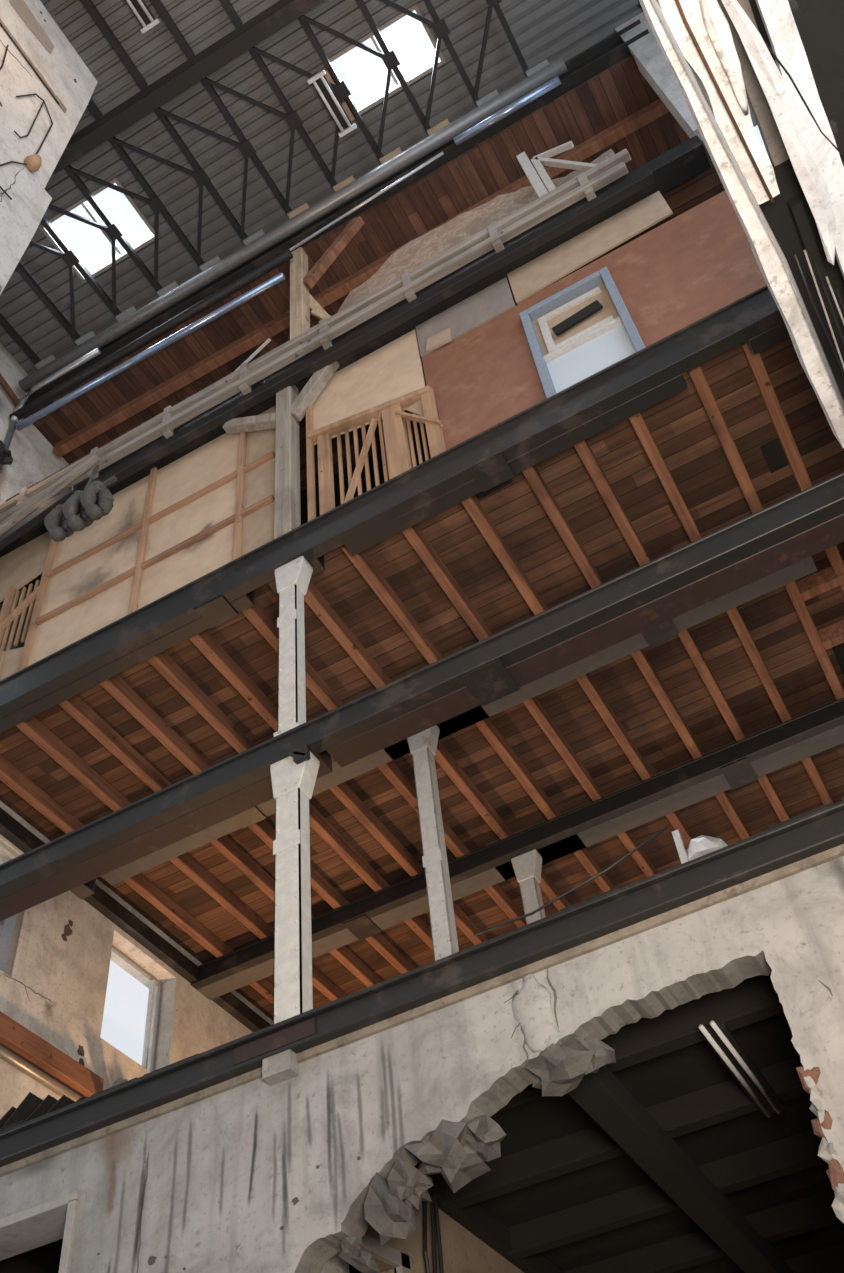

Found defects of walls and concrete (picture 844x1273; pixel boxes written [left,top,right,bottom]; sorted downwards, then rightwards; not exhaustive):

spalling [338,1115,506,1273]
spalling [524,1037,616,1096]
flaking render [796,1066,844,1223]